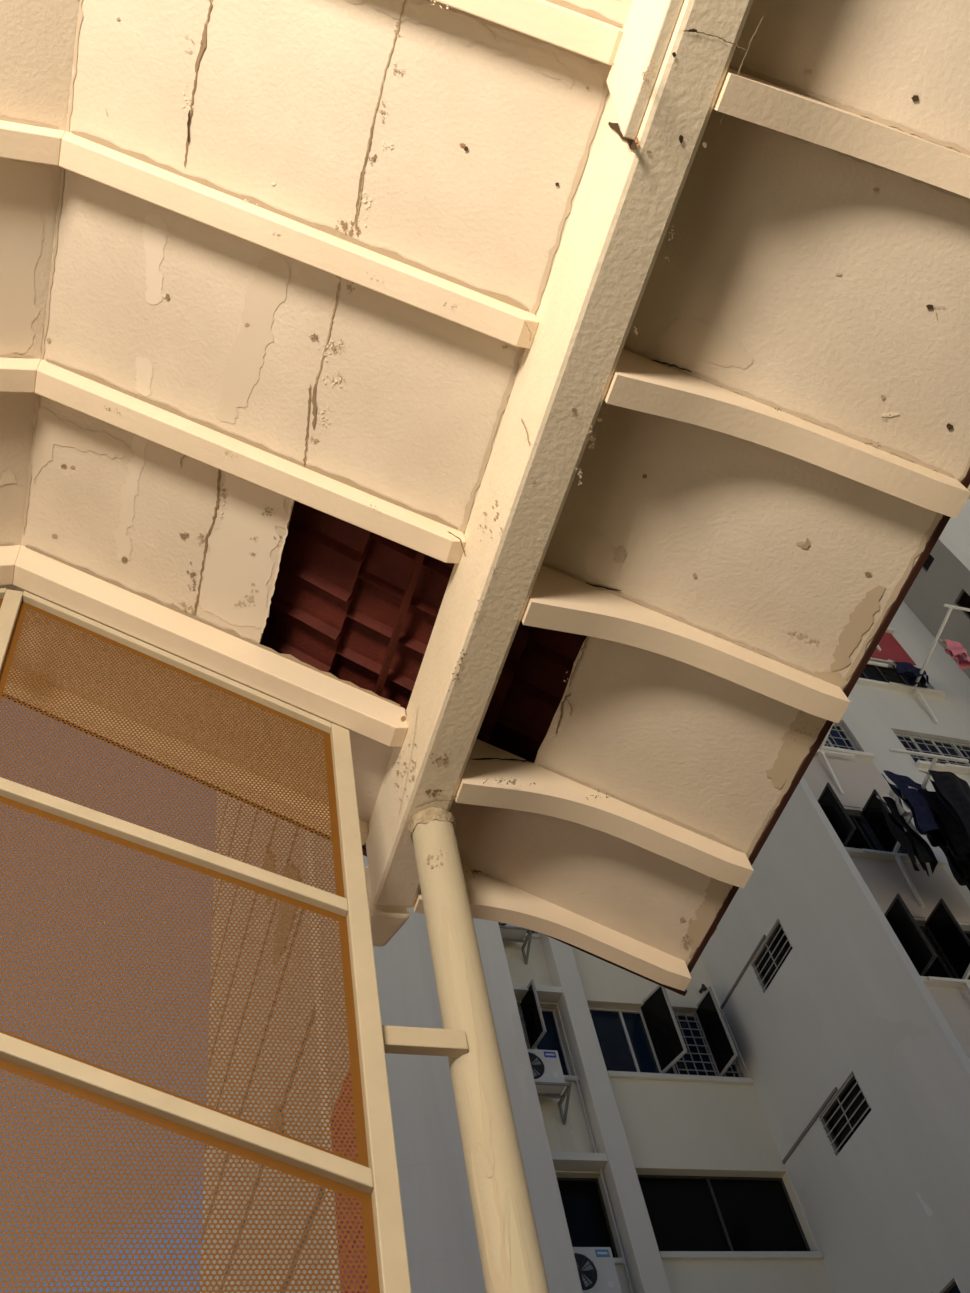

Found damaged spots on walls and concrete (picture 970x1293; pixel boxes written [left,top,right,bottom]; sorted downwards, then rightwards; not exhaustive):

crack [184,0,212,167]
crack [354,0,406,228]
crack [303,283,339,468]
crack [194,469,220,615]